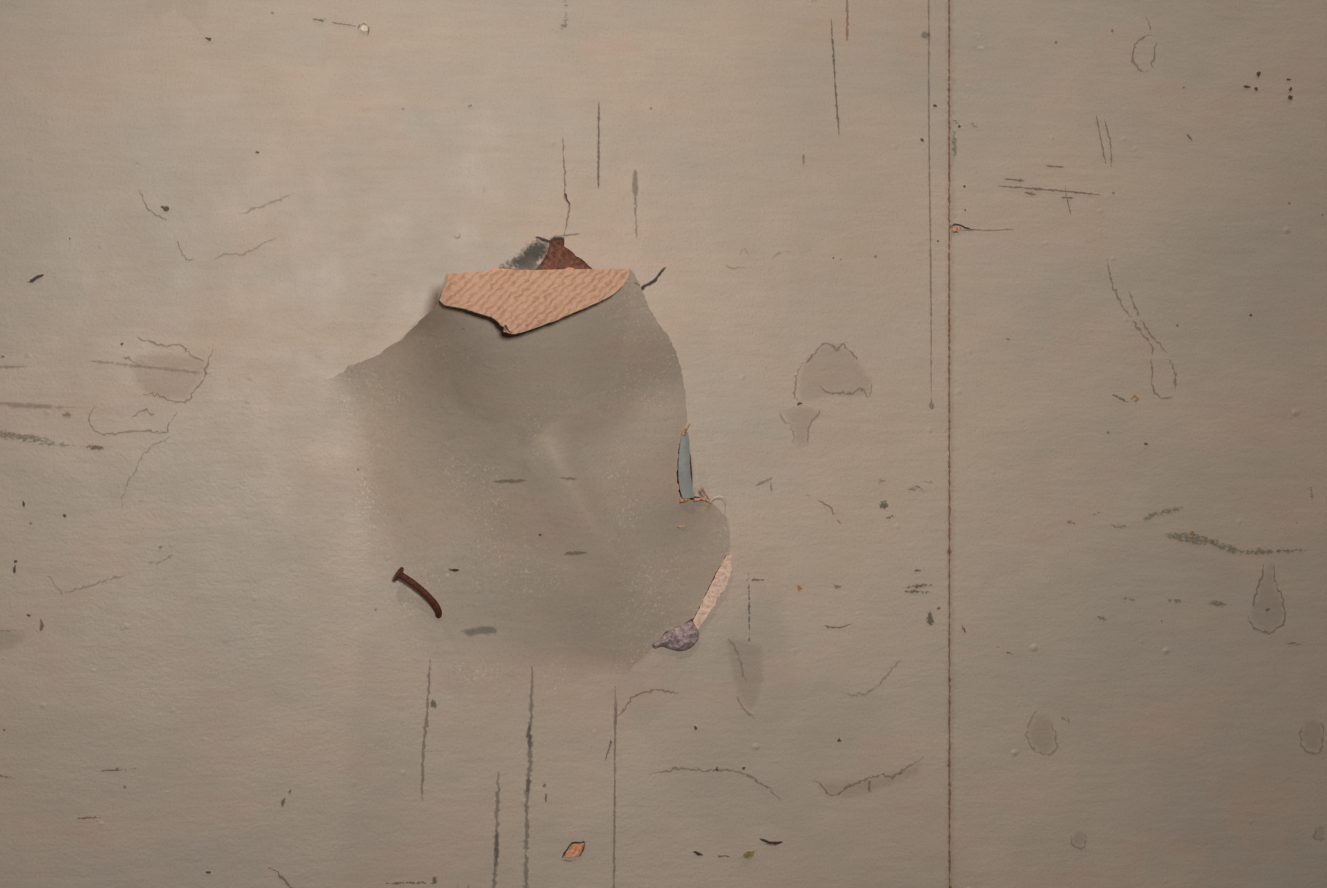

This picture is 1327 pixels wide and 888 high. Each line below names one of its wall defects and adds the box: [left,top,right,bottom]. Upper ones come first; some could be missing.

spalling [503,242,549,269]
crack [635,267,666,290]